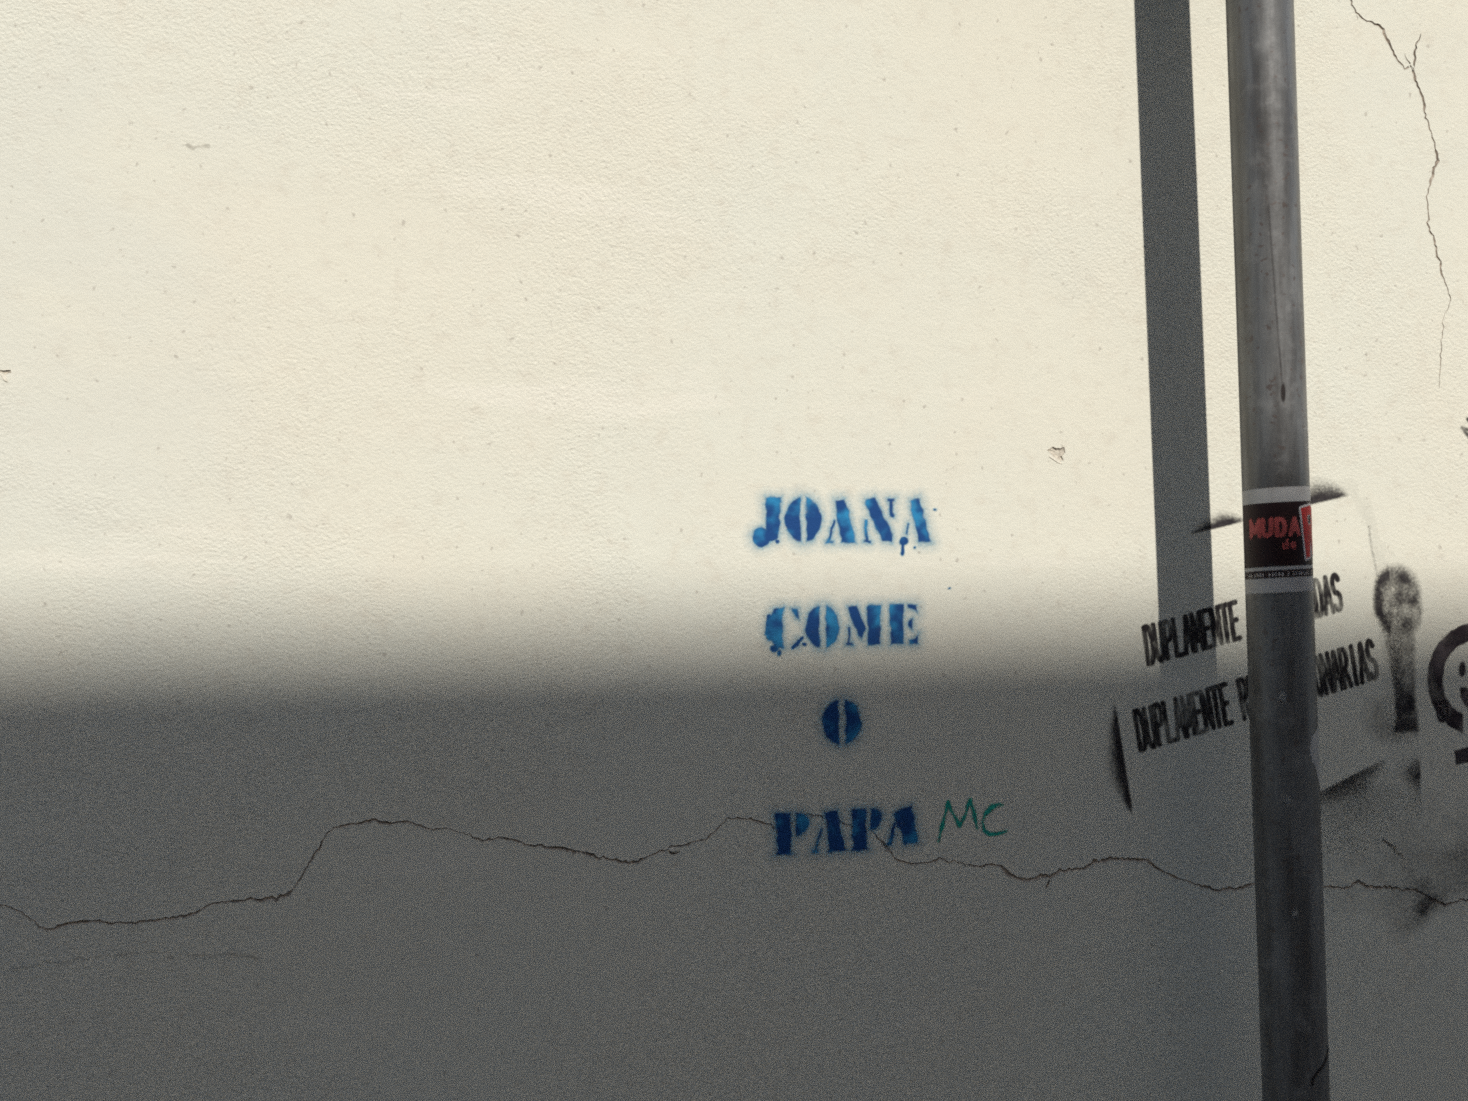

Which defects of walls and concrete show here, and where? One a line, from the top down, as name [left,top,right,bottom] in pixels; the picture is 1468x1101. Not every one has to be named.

crack [1349,0,1452,388]
crack [0,812,1255,932]
crack [1323,878,1468,914]